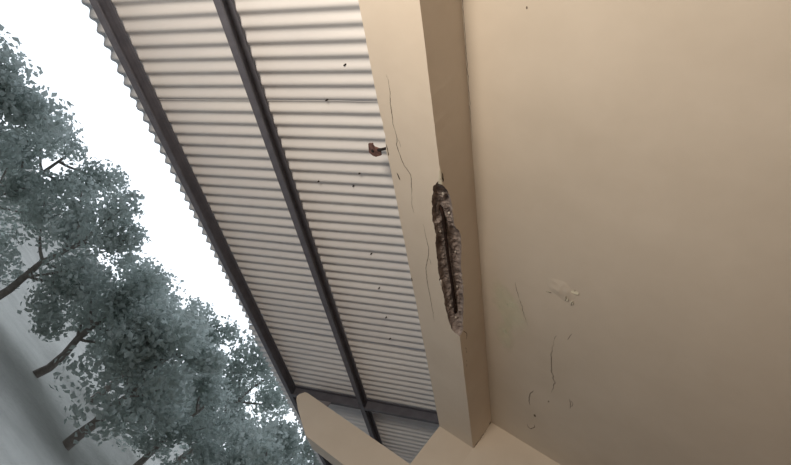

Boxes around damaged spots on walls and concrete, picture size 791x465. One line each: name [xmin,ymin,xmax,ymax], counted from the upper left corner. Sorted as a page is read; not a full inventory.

spalling [431,169,464,336]